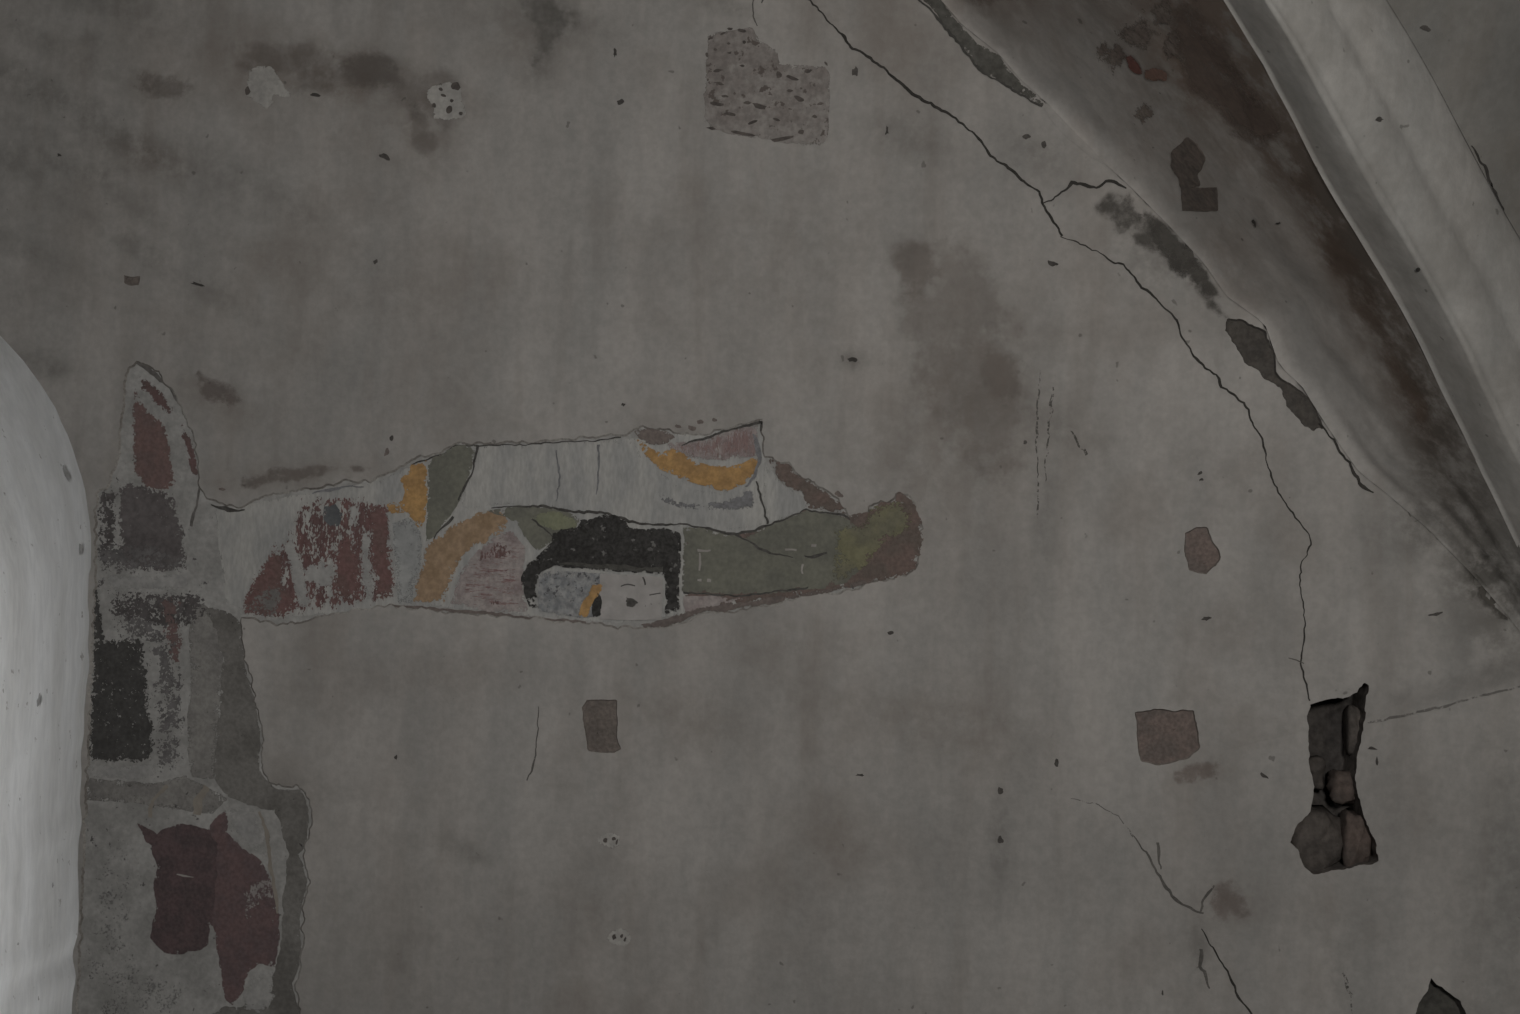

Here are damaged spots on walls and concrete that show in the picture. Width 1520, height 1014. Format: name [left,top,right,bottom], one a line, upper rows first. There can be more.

spalling [918,0,1046,107]
damp [1145,214,1217,295]
crack [809,0,1312,701]
spalling [1225,318,1323,431]
crack [1319,422,1374,493]
spalling [1184,527,1221,574]
damp [1473,576,1508,619]
peeling [75,361,924,1014]
spalling [1135,709,1200,766]
spalling [1290,683,1379,874]
crack [1071,798,1252,1014]
spalling [1416,978,1466,1014]